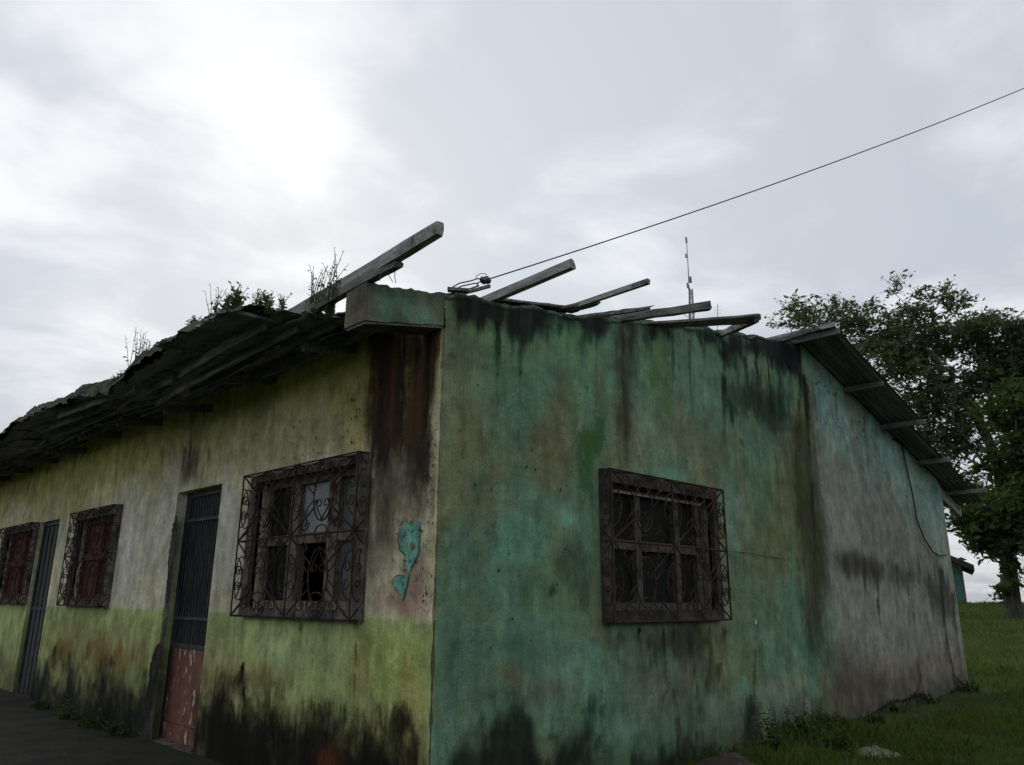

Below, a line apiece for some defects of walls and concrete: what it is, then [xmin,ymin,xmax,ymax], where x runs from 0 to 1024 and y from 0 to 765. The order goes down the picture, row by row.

water stain [455,295,609,357]
water stain [617,321,674,442]
peeling [389,415,437,608]
water stain [24,647,146,733]
water stain [194,670,418,765]
water stain [452,705,597,765]